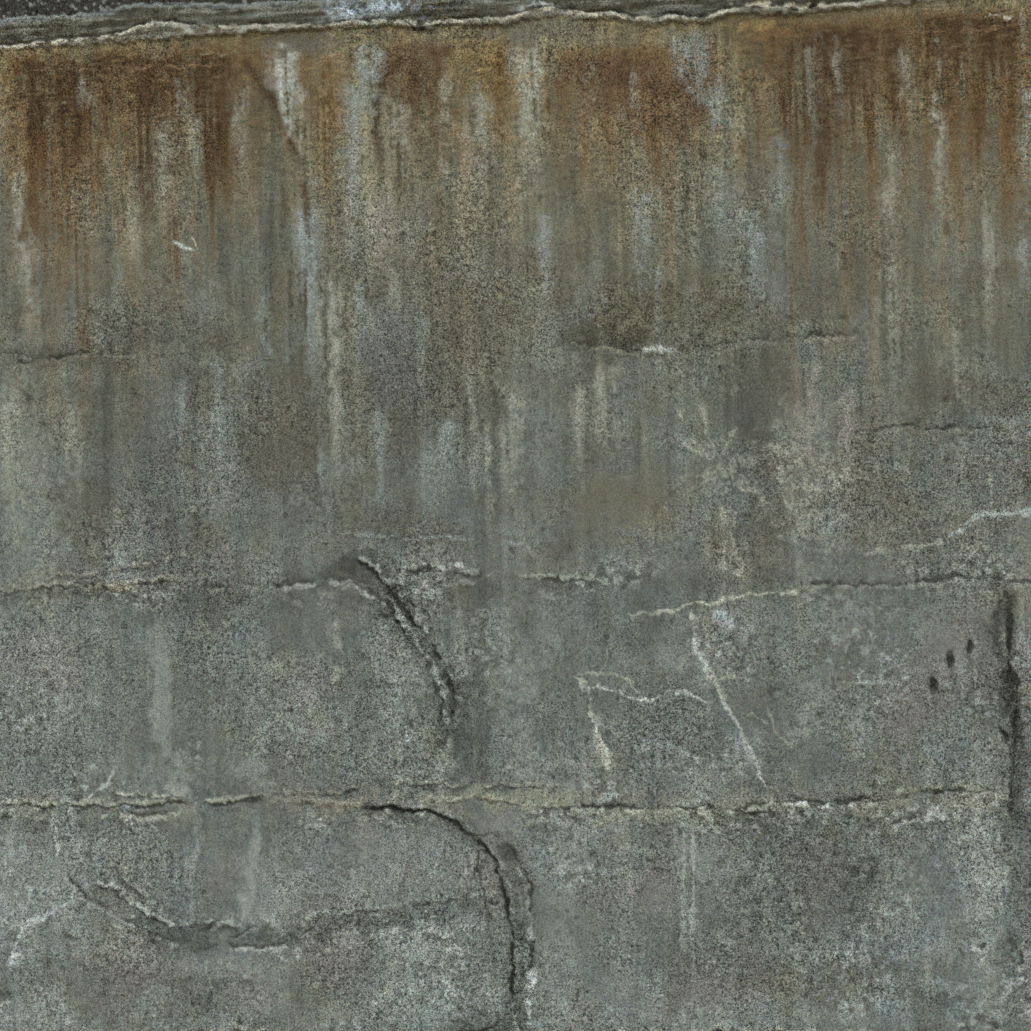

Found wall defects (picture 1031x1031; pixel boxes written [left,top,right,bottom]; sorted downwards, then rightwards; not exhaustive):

rust [0,39,352,345]
damp [0,42,442,778]
rust [369,36,526,301]
damp [408,24,879,594]
rust [532,3,1031,451]
damp [870,134,909,383]
damp [890,46,917,115]
damp [926,92,953,194]
damp [941,323,972,487]
damp [978,198,1031,369]
damp [446,643,502,786]
crack [0,411,1031,1031]